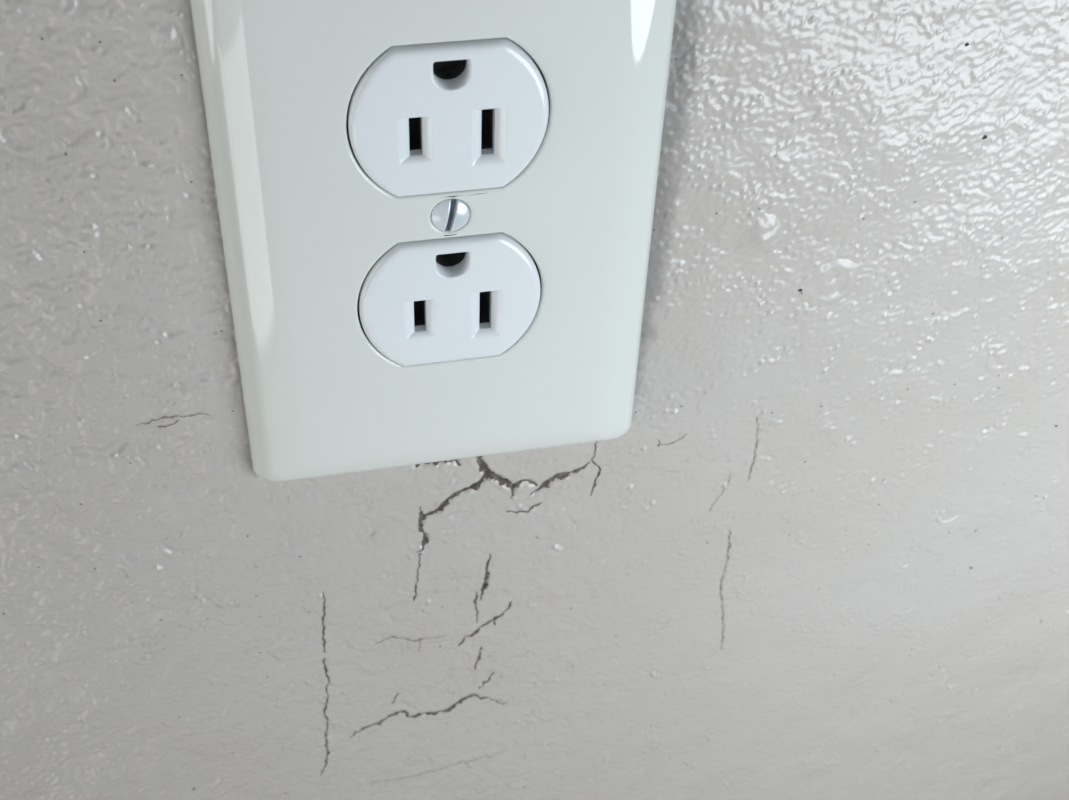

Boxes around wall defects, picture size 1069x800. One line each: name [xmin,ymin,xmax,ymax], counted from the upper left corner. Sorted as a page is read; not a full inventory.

crack [413,442,601,601]
crack [321,554,512,775]